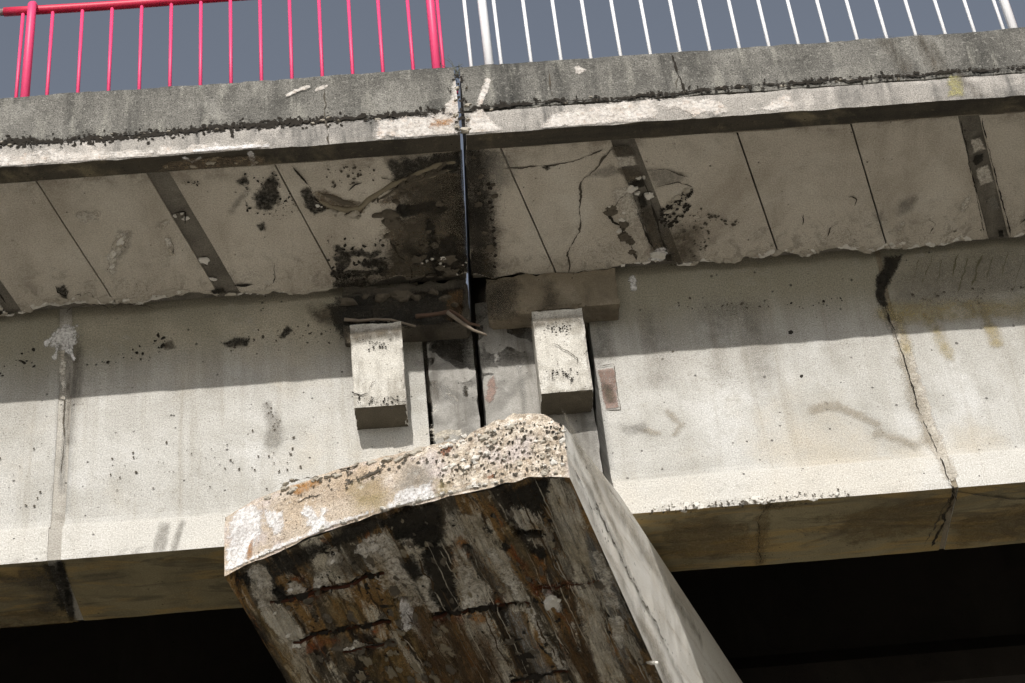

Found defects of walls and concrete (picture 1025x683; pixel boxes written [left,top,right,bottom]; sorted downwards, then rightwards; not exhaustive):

water stain [183,144,326,231]
water stain [327,149,510,319]
spalling [224,421,567,503]
water stain [498,327,532,369]
crack [882,297,1025,546]
spalling [271,490,569,683]